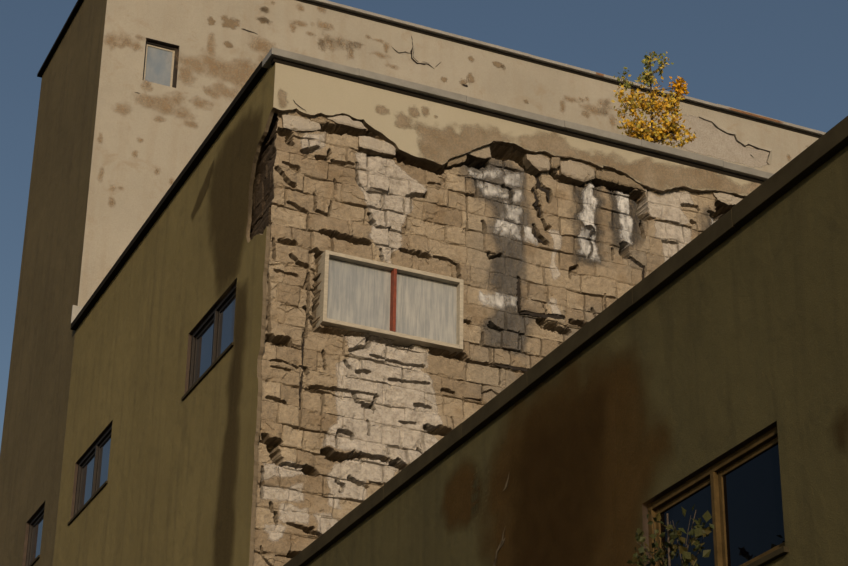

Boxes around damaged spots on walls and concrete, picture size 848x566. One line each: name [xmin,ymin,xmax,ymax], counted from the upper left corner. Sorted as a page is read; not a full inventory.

leakage [208,16,239,29]
leakage [181,36,254,107]
crack [391,36,441,69]
crack [699,114,772,165]
spalling [250,110,769,566]